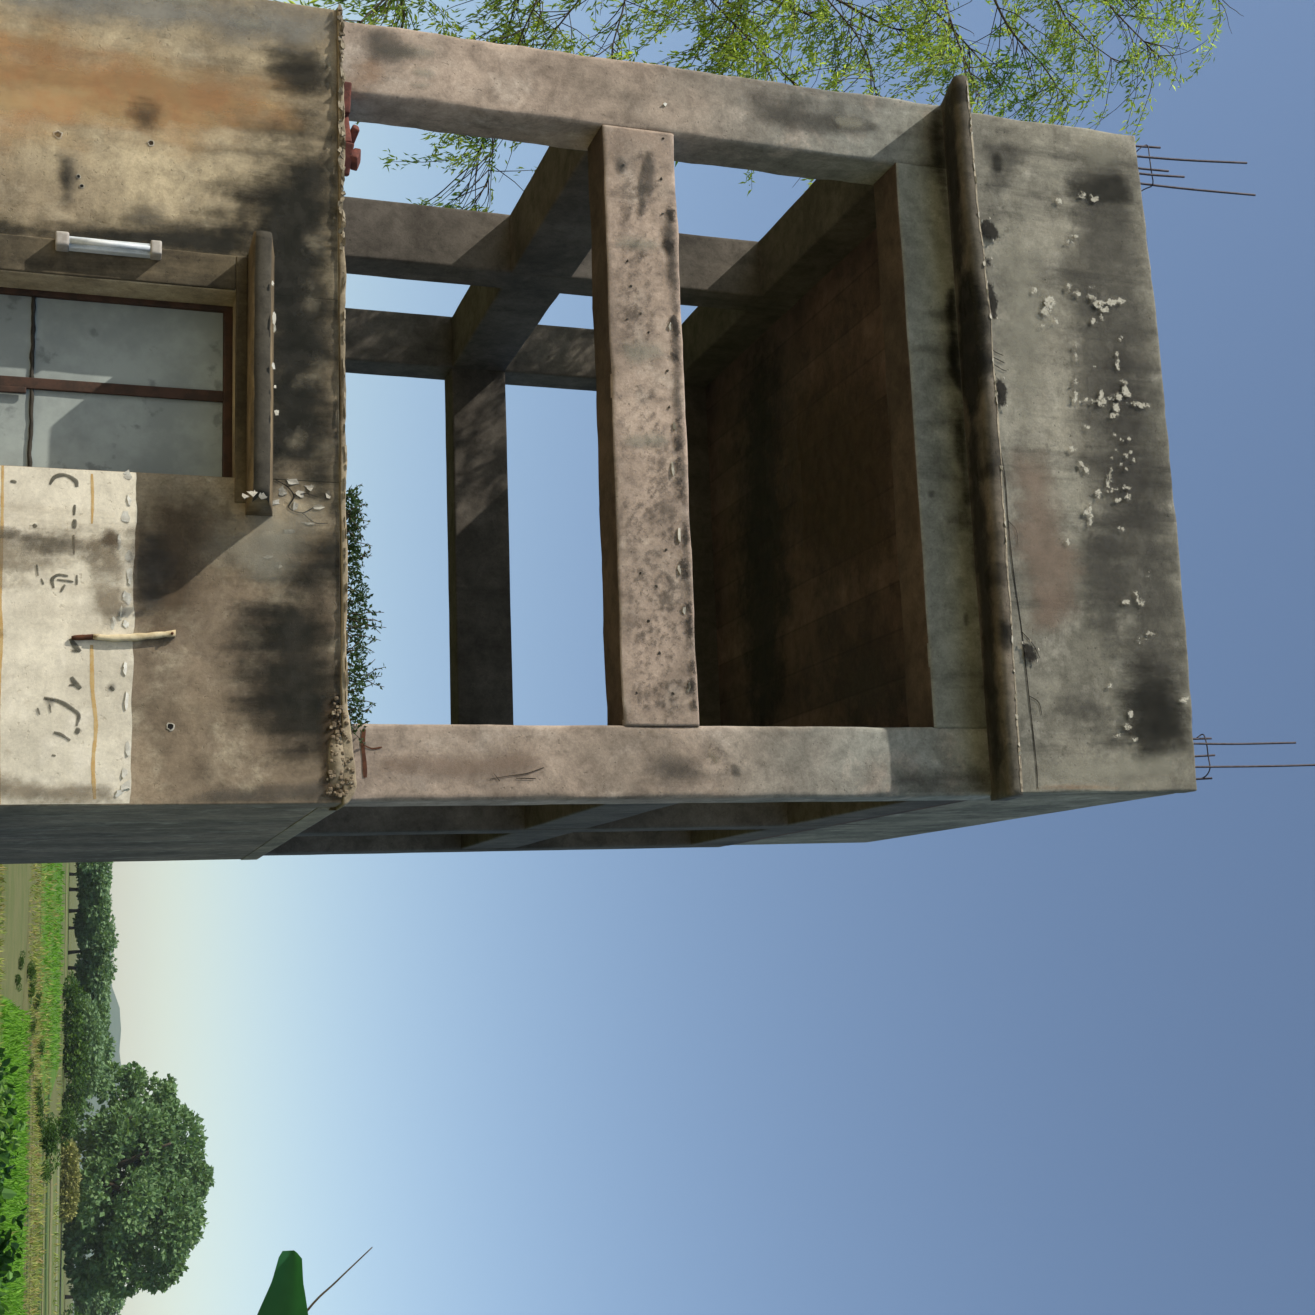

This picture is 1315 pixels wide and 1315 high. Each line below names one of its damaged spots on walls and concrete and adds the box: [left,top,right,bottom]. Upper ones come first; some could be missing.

water stain [21,0,328,91]
water stain [0,220,53,236]
water stain [69,151,339,514]
peeling [1032,287,1059,327]
peeling [1067,283,1126,324]
peeling [1072,338,1150,526]
water stain [1069,173,1165,628]
water stain [137,508,204,610]
water stain [244,542,340,751]
spalling [326,517,355,798]
water stain [1127,651,1182,754]